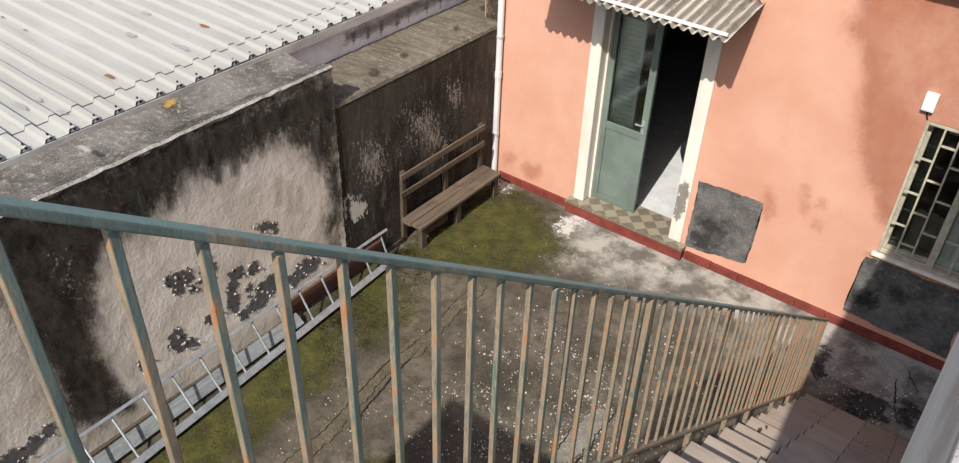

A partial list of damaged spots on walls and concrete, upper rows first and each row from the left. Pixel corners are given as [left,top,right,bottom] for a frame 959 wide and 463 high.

leakage [40,75,341,244]
peeling [251,218,279,235]
peeling [163,263,203,296]
peeling [213,260,277,322]
peeling [288,256,326,289]
leakage [0,217,134,428]
peeling [167,326,201,356]
crack [283,290,468,463]
crack [893,371,918,420]
peeling [0,422,57,463]